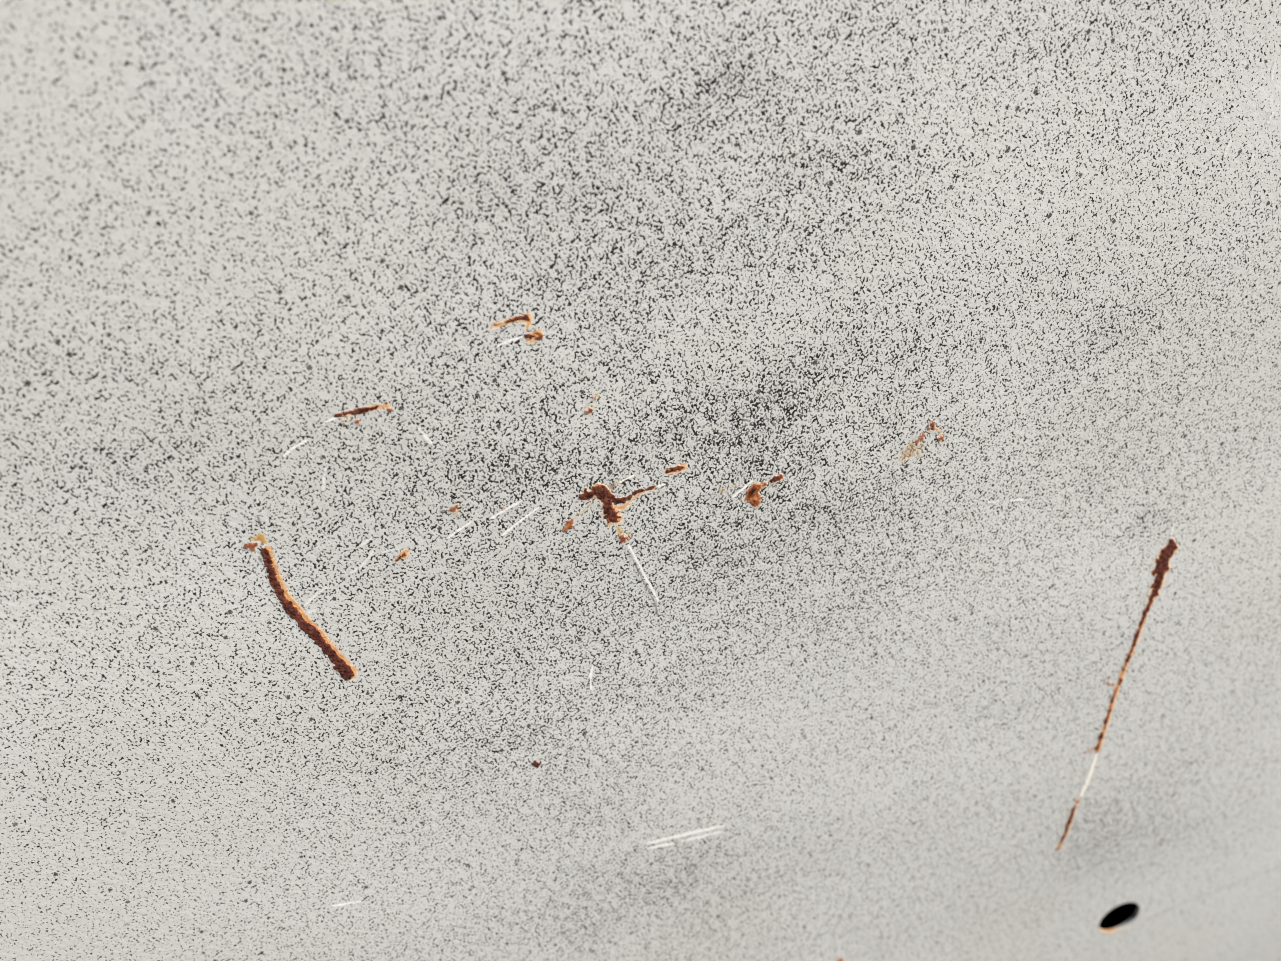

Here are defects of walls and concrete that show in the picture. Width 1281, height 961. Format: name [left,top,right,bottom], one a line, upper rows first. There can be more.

rust [487,310,546,347]
rust [332,400,394,427]
rust [560,461,690,546]
rust [715,470,788,510]
rust [242,540,360,683]
rust [1093,536,1180,755]